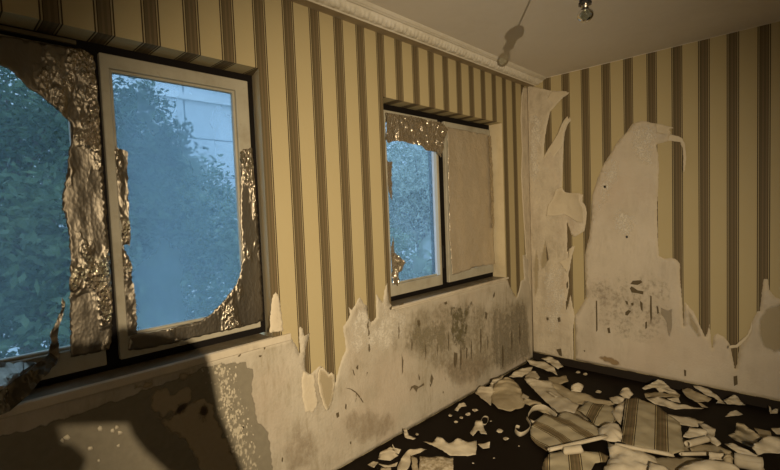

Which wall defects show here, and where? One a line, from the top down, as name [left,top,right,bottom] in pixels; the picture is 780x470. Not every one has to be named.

water stain [353,302,529,379]
spalling [625,280,659,329]
spalling [0,354,273,470]